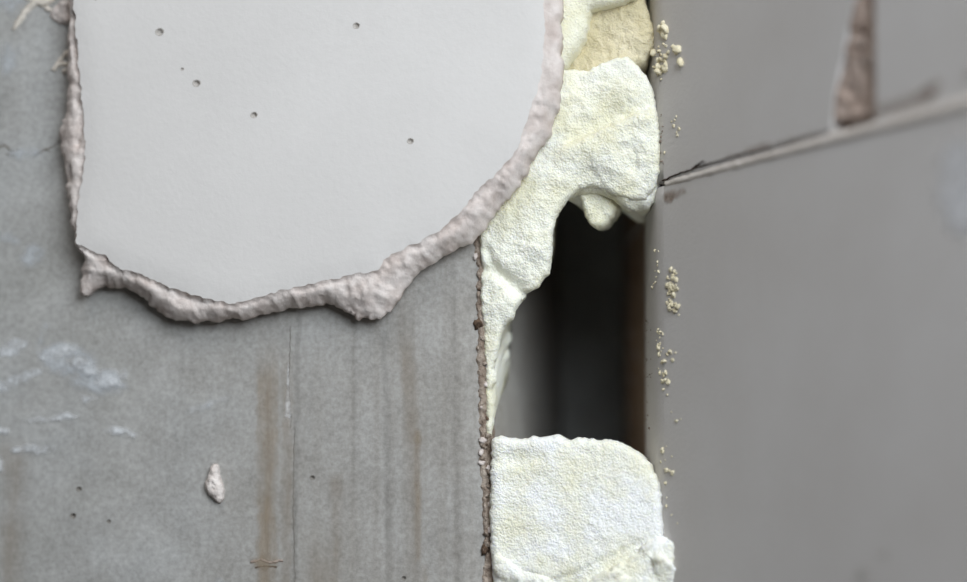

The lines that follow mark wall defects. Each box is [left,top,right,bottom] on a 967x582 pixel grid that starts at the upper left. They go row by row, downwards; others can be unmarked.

spalling [833,0,876,123]
crack [662,131,825,181]
efflorescence [41,344,118,400]
spalling [473,236,495,582]